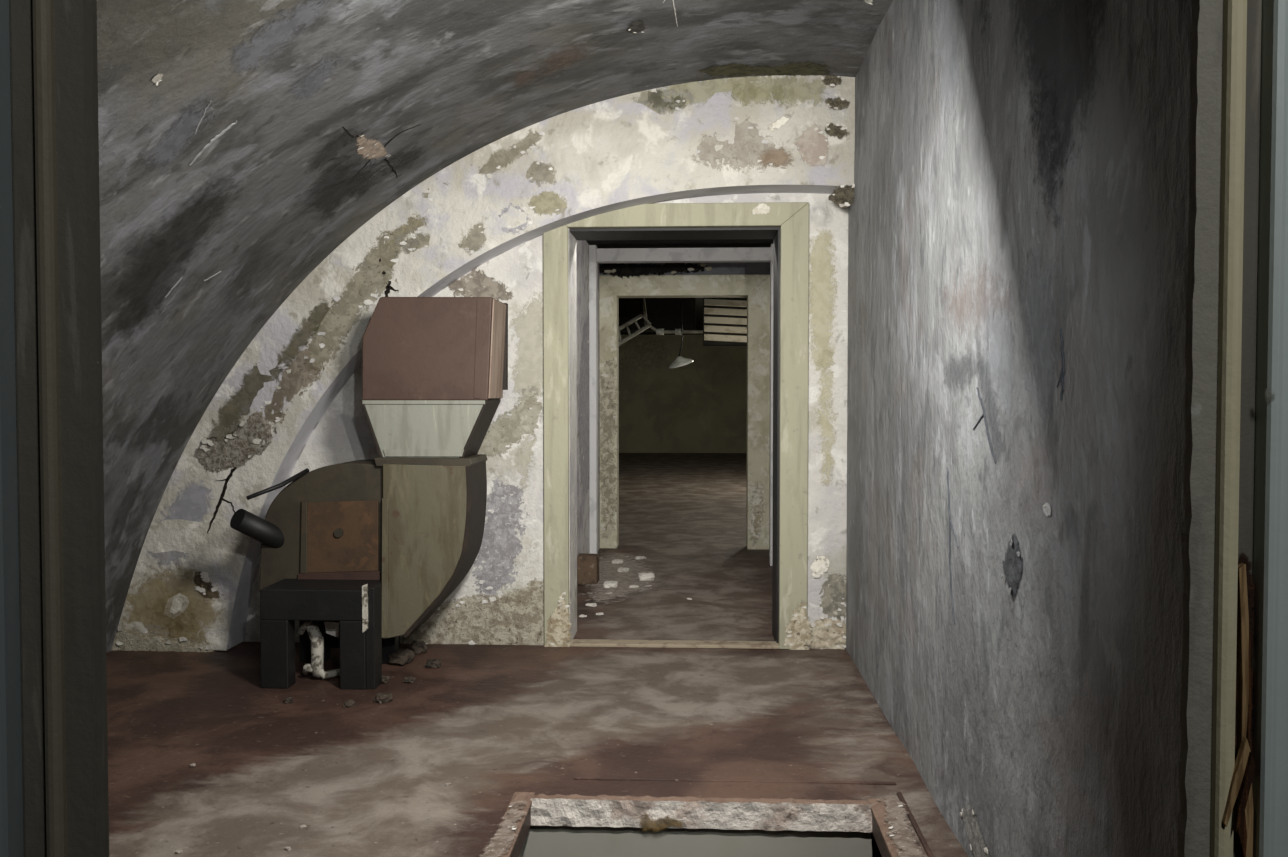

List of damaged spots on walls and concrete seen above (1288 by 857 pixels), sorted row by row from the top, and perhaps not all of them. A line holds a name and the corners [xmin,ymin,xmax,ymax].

flaking render [343,124,421,178]
peeling [632,88,685,115]
peeling [692,75,850,173]
peeling [194,183,446,474]
crack [207,467,237,533]
peeling [400,476,604,647]
flaking render [783,556,846,650]